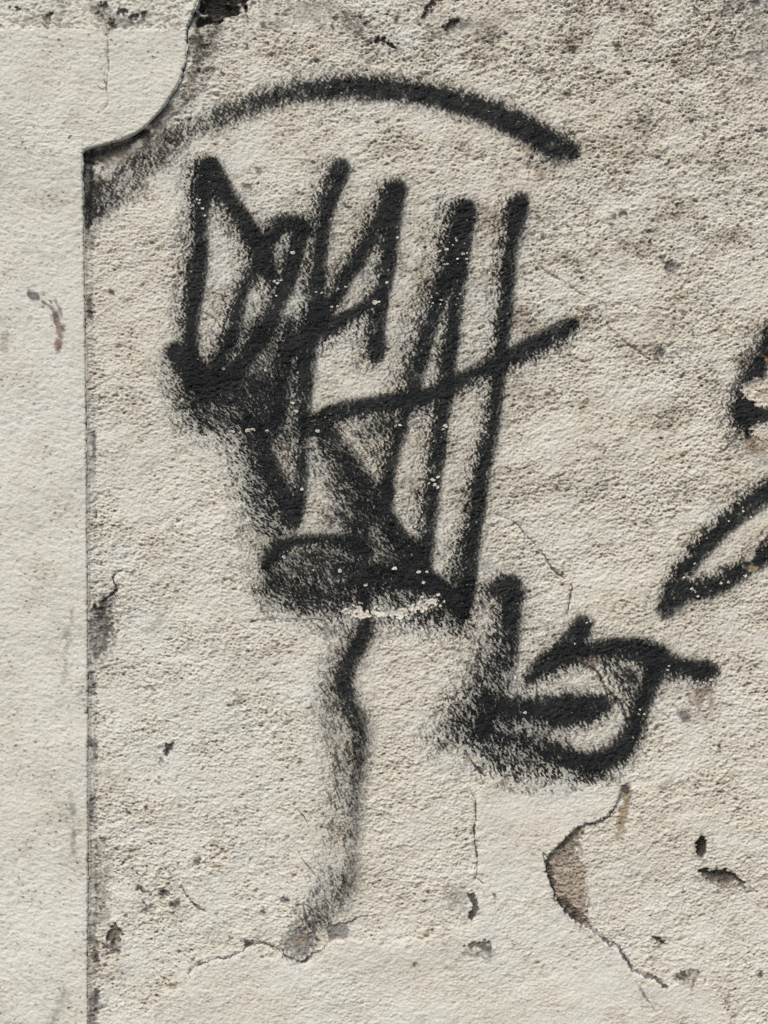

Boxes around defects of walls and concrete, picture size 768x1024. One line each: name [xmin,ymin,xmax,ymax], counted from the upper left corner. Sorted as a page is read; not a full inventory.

spalling [194,0,254,45]
spalling [542,791,700,1009]
spalling [698,867,745,888]
crack [188,939,283,978]